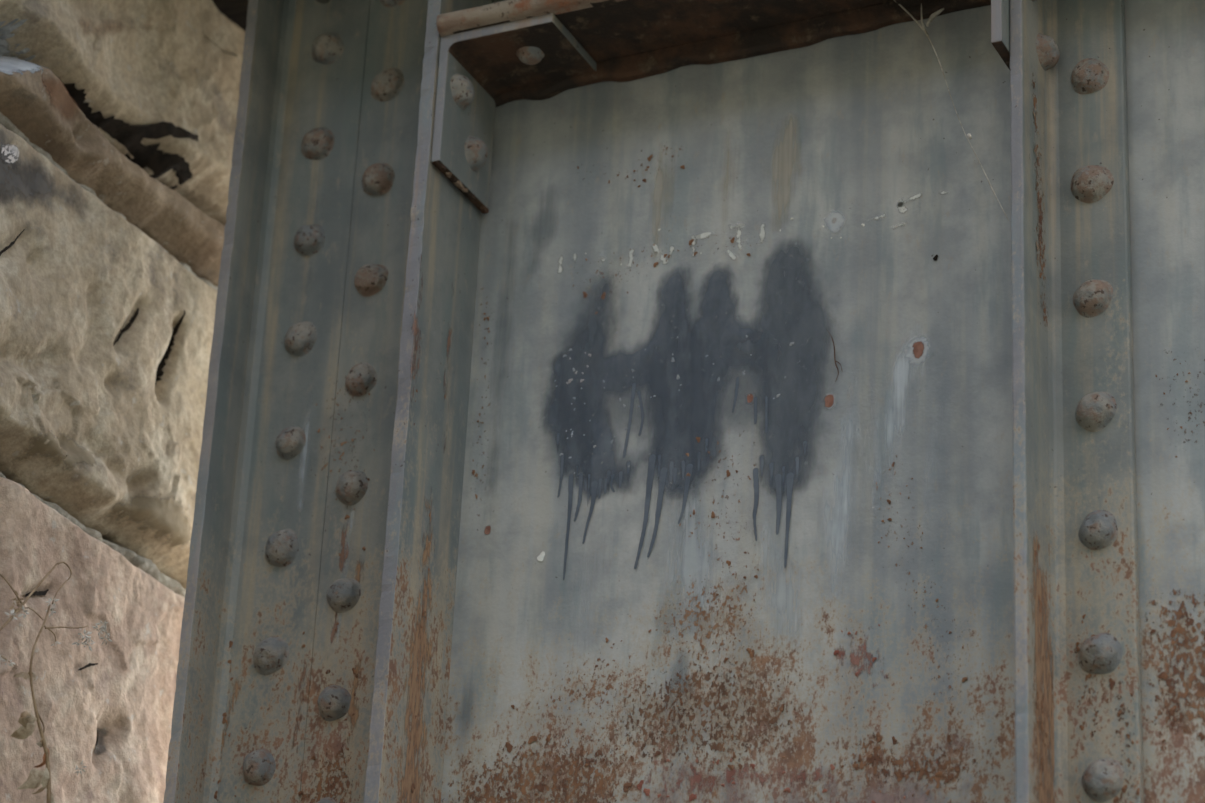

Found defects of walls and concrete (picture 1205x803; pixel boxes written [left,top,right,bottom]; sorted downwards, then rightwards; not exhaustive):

crack [0,229,25,256]
rust [906,338,929,364]
rust [294,661,361,803]
rust [397,503,433,803]
rust [442,437,978,803]
rust [1074,589,1205,803]